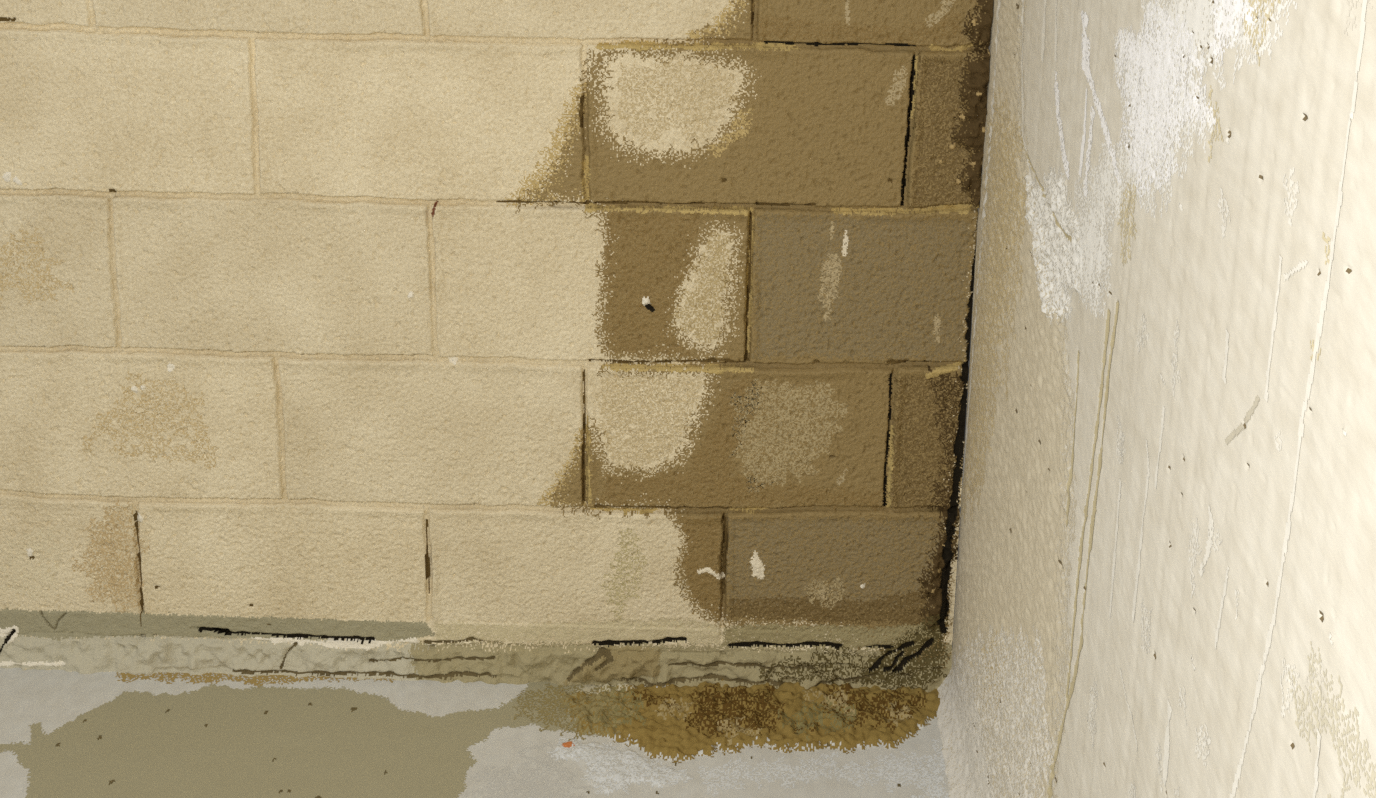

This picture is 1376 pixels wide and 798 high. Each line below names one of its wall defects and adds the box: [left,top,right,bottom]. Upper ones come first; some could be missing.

damp [1242,0,1281,66]
damp [1206,85,1223,162]
damp [1117,179,1137,266]
damp [505,0,1055,798]
crack [567,202,976,689]